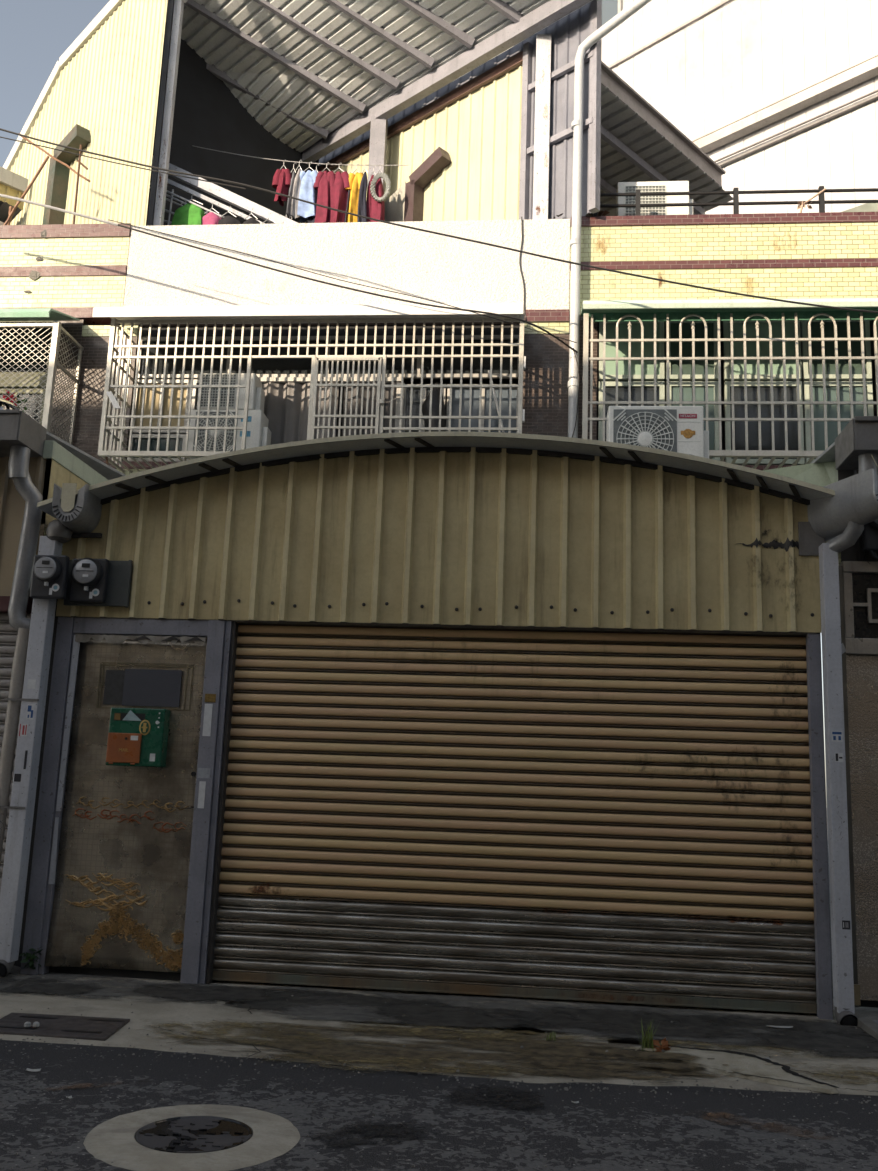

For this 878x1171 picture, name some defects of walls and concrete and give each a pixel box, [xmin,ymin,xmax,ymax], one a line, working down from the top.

damp [0,975,878,1084]
crack [670,1046,878,1092]